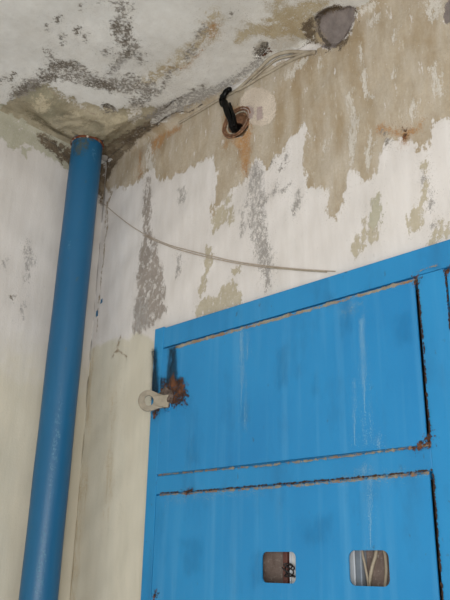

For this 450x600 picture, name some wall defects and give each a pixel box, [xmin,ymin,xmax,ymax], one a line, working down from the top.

water stain [0,0,330,122]
rust [219,113,257,182]
peeling [105,0,450,245]
rust [369,112,429,150]
peeling [350,191,388,261]
peeling [195,244,243,318]